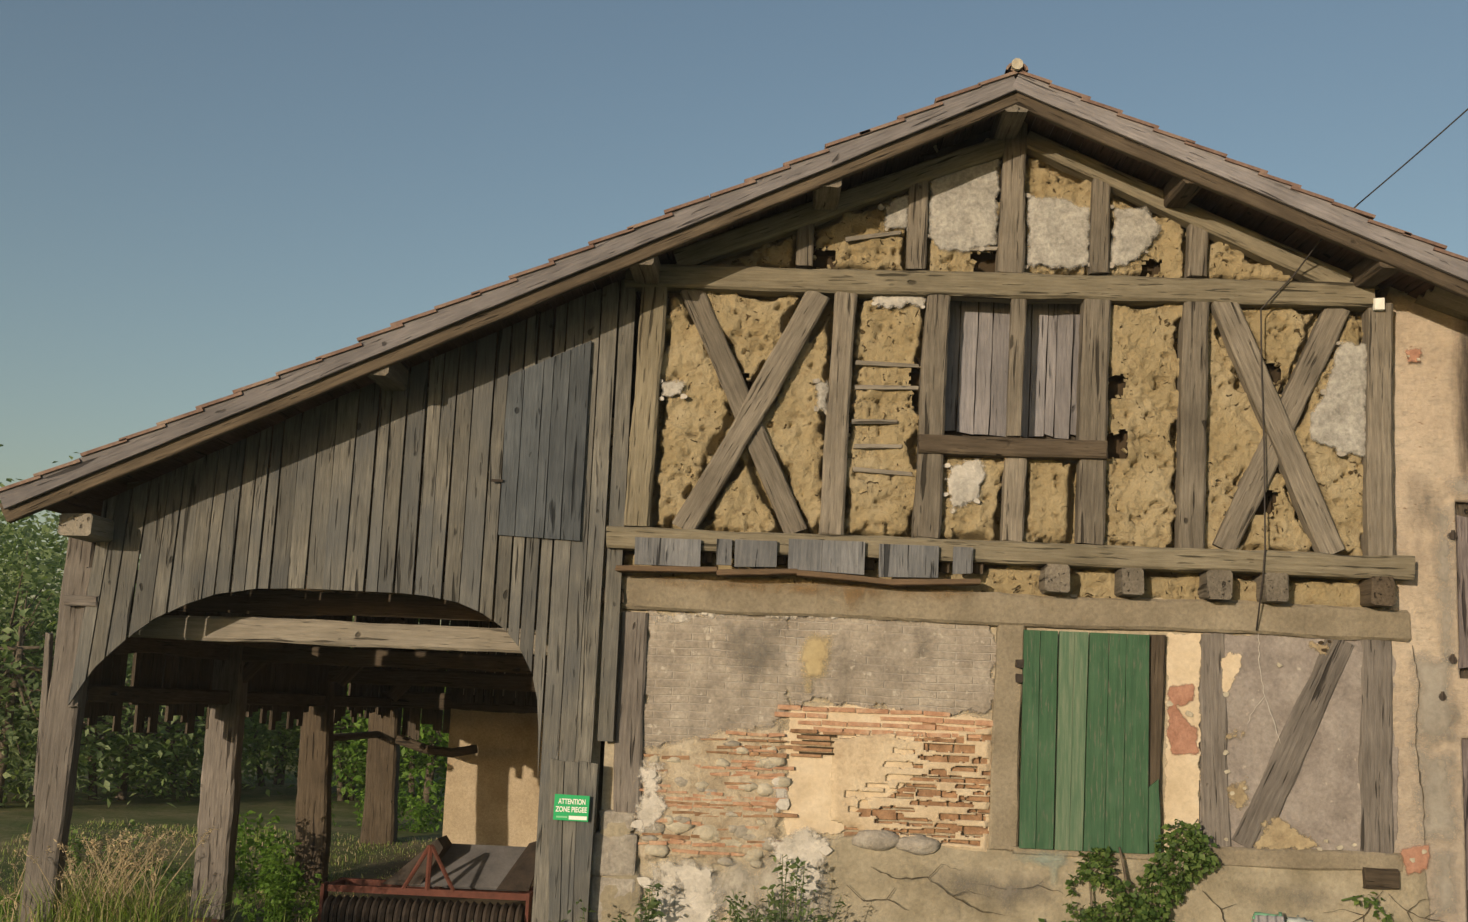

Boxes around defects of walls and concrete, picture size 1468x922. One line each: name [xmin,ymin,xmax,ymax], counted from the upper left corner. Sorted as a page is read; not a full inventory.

flaking render [1166,684,1199,755]
flaking render [630,704,993,922]
crack [847,864,1062,915]